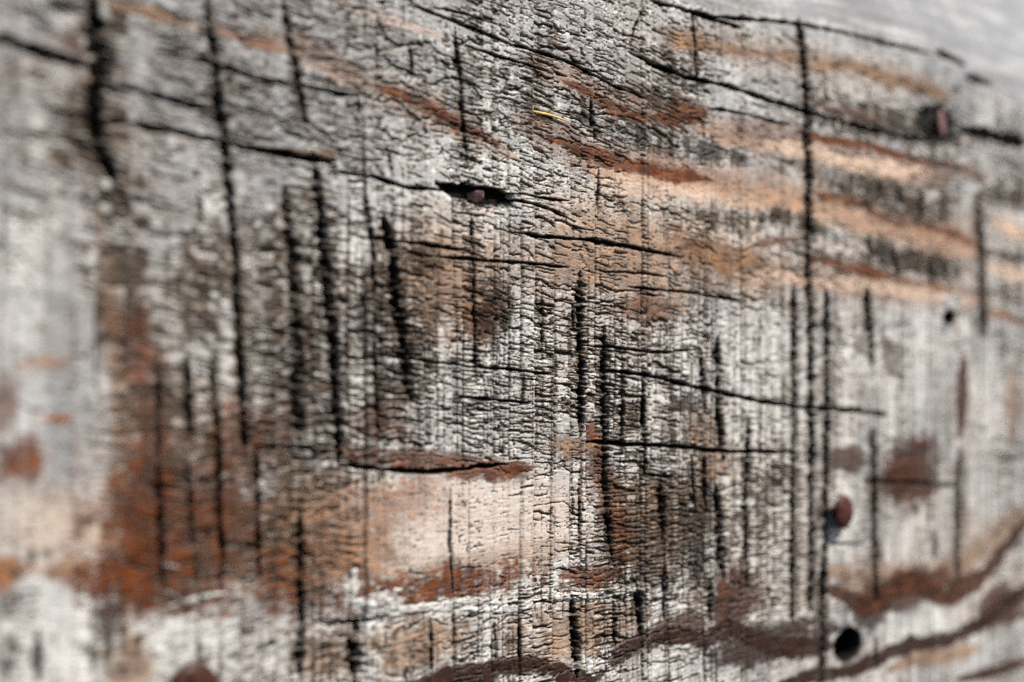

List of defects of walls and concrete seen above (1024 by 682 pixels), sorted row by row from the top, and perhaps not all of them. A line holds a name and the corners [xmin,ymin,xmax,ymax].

crack [410,3,651,169]
rust [562,80,987,180]
rust [810,60,947,98]
crack [958,126,1024,150]
crack [0,0,567,592]
crack [507,193,742,302]
crack [570,0,991,682]
crack [30,632,41,675]
crack [291,520,384,675]
crack [404,615,455,682]
crack [492,621,521,665]
crack [567,600,579,677]